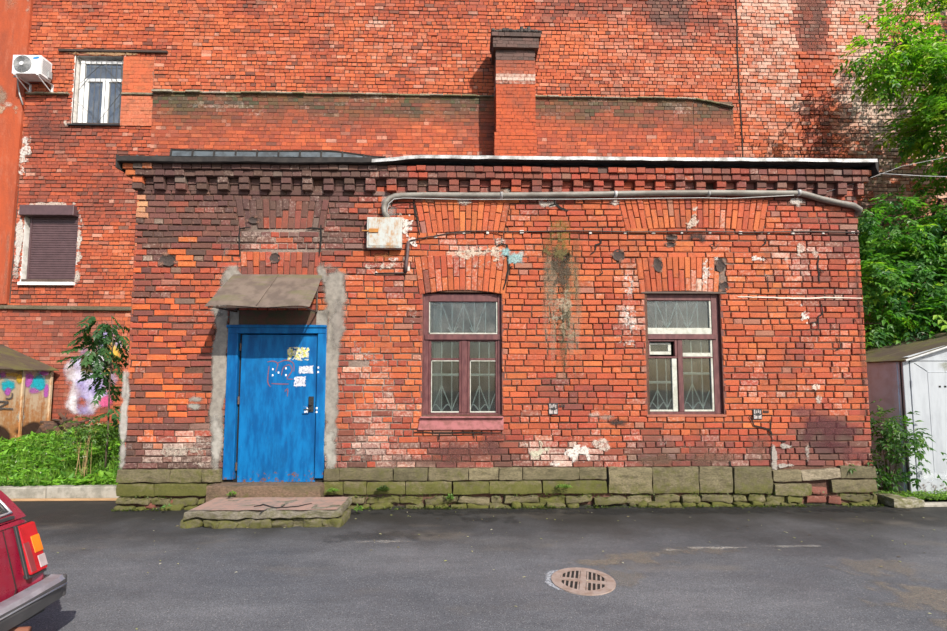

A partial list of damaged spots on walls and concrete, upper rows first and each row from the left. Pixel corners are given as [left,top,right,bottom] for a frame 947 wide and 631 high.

flaking render [18,136,31,174]
flaking render [448,239,505,271]
damp [542,235,581,367]